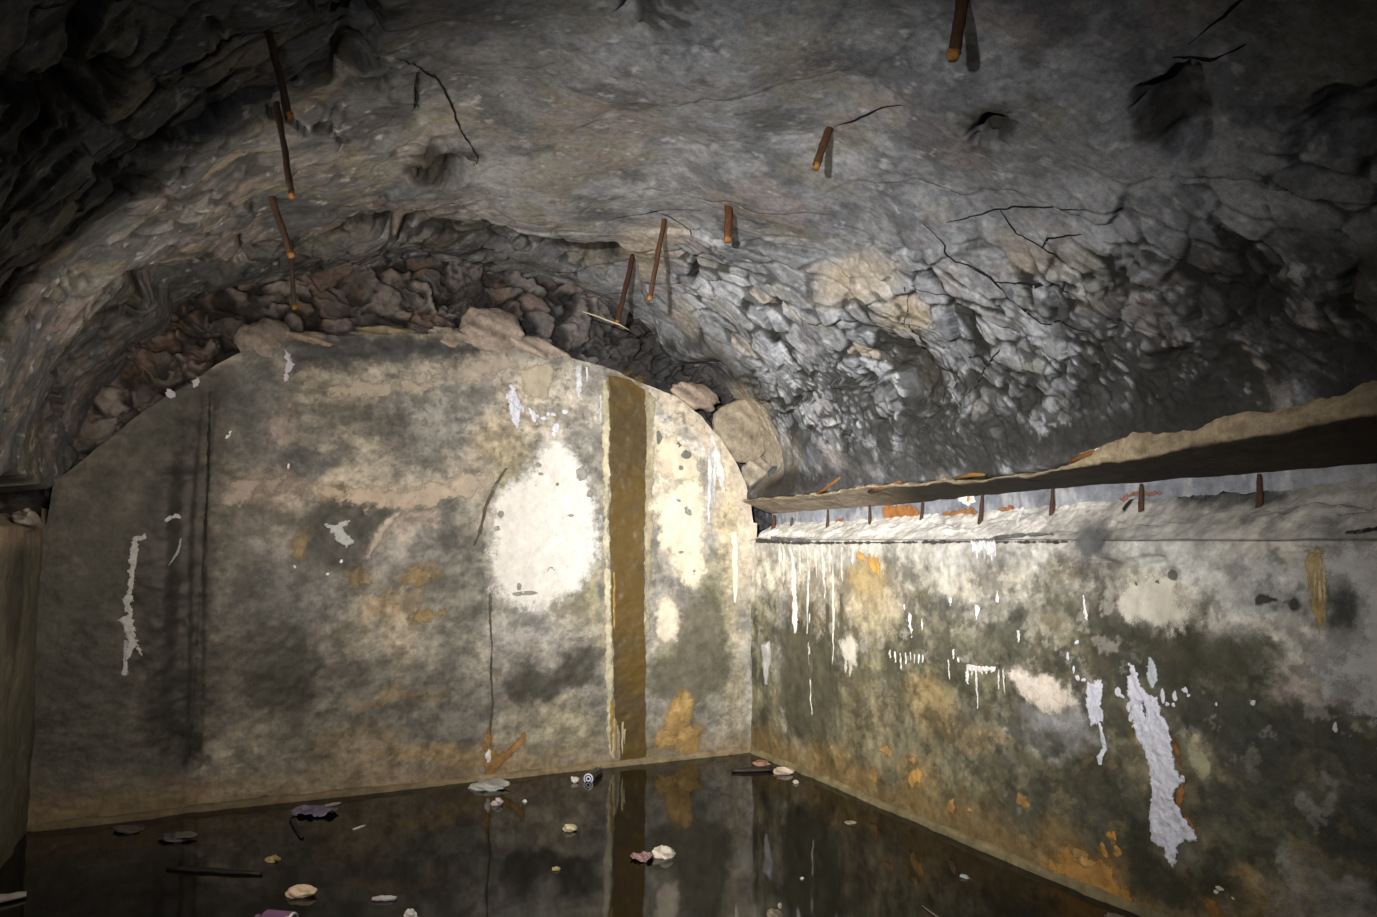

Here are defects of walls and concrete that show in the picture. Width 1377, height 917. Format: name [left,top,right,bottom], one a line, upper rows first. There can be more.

crack [392,56,479,164]
crack [904,206,1091,402]
rust [602,376,703,760]
crack [1346,526,1377,534]
water stain [761,544,854,741]
spalling [838,634,857,676]
water stain [947,649,1005,708]
spalling [1006,667,1087,749]
rust [870,746,923,788]
water stain [1066,620,1270,914]
peeling [1173,732,1212,833]
rust [1043,831,1133,902]